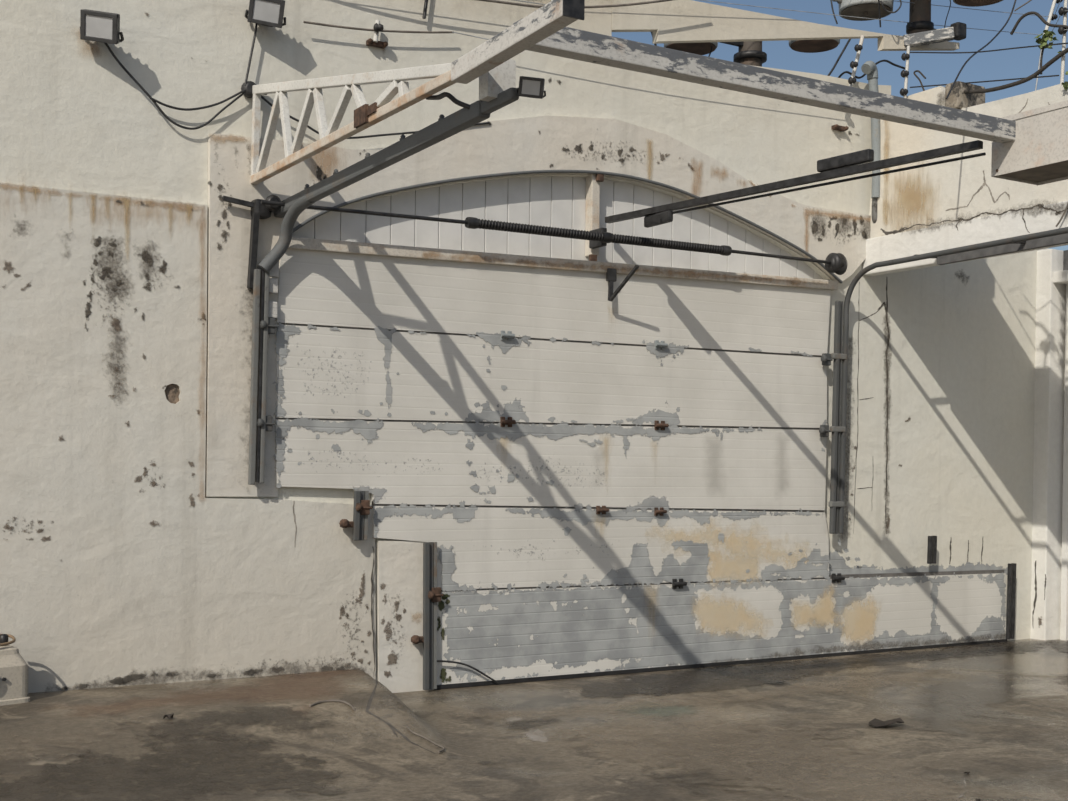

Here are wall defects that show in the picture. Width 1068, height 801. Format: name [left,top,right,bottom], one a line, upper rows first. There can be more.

corrosion [116,198,192,223]
crack [881,170,1068,235]
mould [83,236,136,398]
hole [163,384,180,404]
peeling [273,322,426,489]
peeling [467,332,531,373]
crack [853,279,890,534]
peeling [353,385,762,538]
peeling [505,496,820,536]
mould [56,603,371,690]
peeling [438,533,1008,682]
leakage [577,593,1068,698]